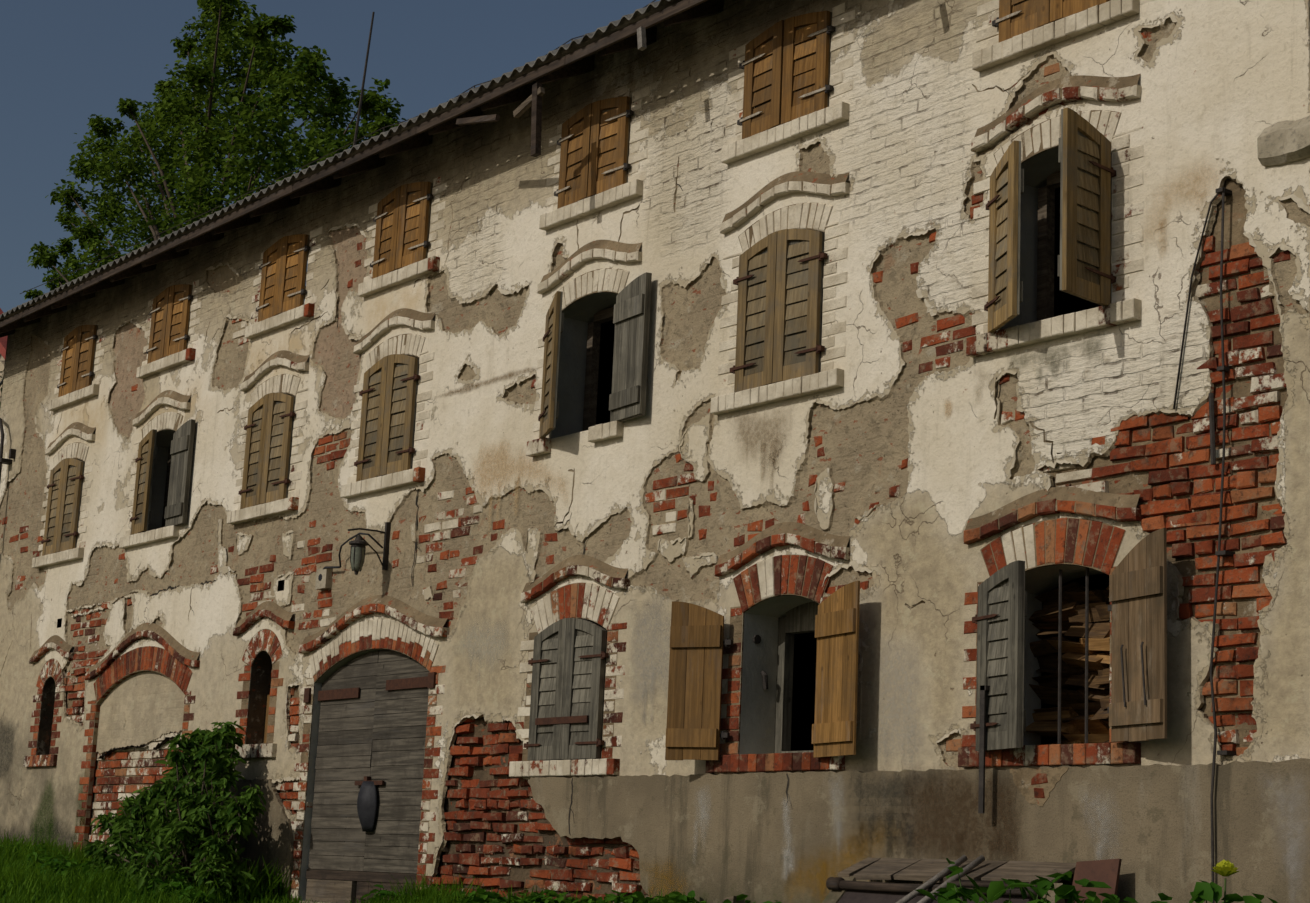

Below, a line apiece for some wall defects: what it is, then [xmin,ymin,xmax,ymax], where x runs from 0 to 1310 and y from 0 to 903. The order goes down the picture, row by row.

spalling [1005,52,1072,113]
spalling [59,223,632,726]
spalling [630,227,976,602]
spalling [996,178,1310,756]
spalling [431,714,650,903]